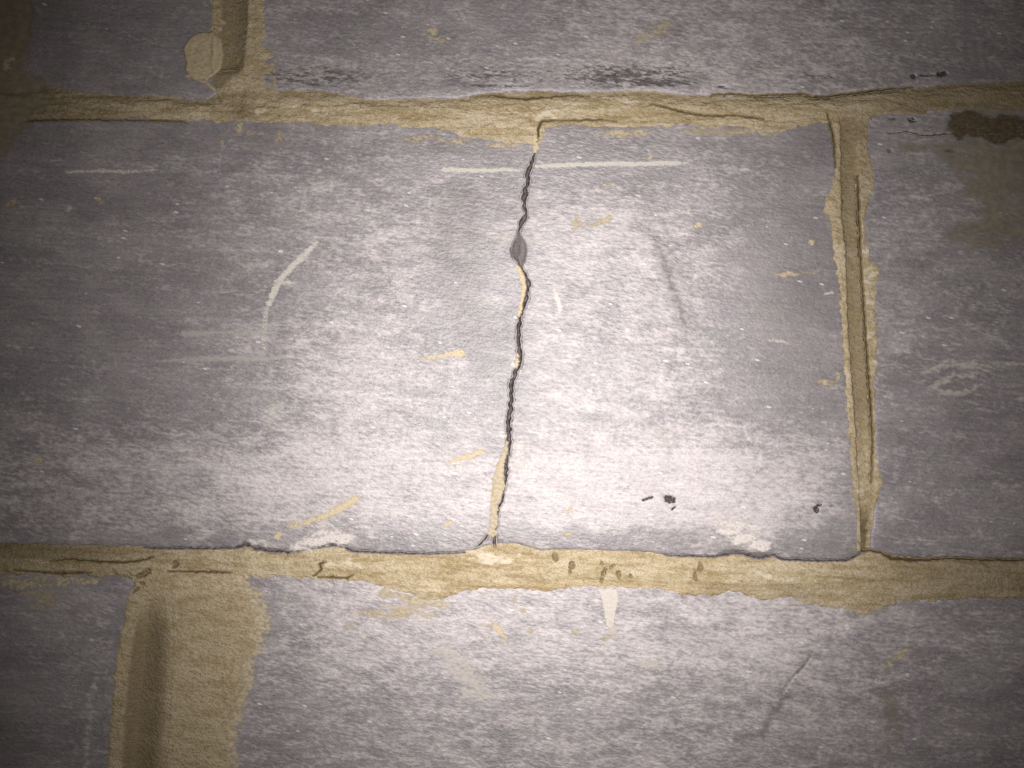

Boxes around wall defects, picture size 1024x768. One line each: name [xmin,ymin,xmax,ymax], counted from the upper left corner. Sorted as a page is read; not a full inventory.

crack [477,118,618,547]